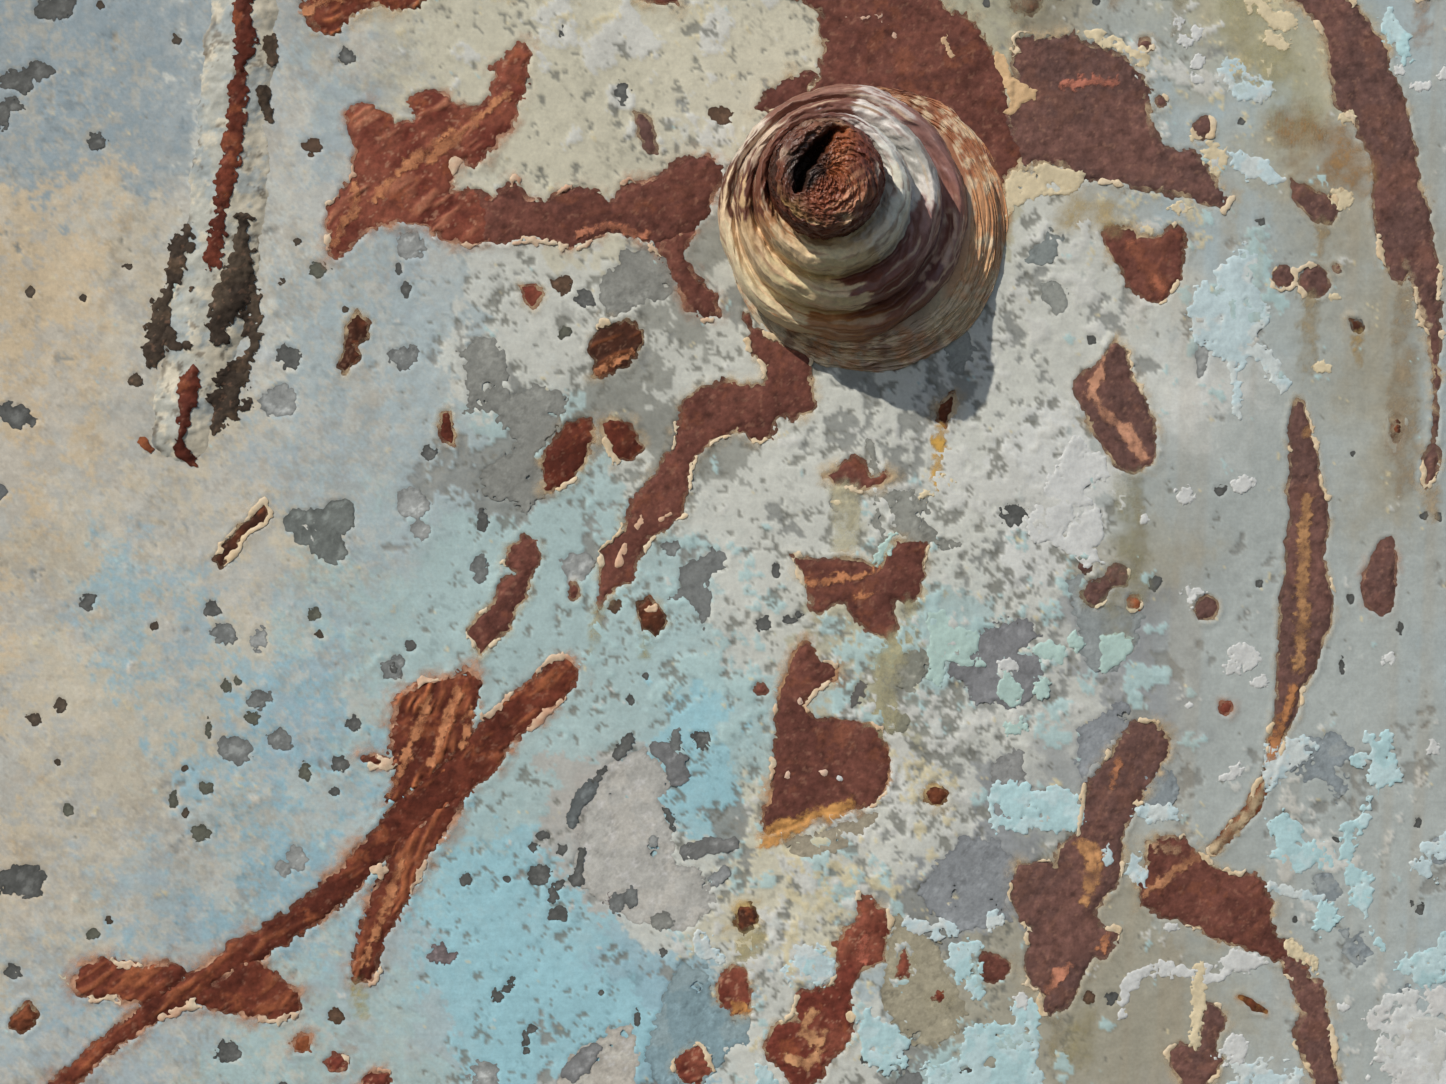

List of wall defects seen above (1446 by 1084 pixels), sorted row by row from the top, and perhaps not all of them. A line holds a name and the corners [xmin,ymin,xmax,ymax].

rust [127,0,279,467]
rust [754,0,1236,215]
rust [1269,0,1446,514]
peeling [0,864,47,899]
peeling [205,676,312,782]
rust [48,533,580,1084]
peeling [283,498,355,566]
peeling [503,727,751,1084]
rust [753,453,930,848]
rust [977,398,1342,1084]
peeling [1083,946,1305,1084]
peeling [1219,729,1446,1084]